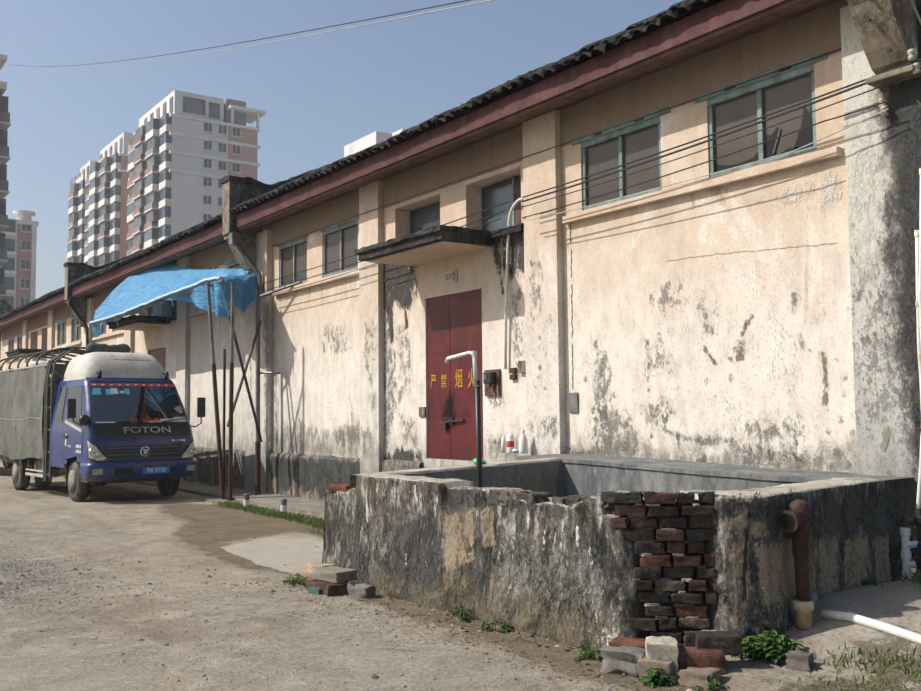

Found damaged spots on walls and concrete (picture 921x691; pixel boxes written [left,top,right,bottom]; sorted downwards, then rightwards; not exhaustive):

damp [912,0,921,62]
damp [263,264,422,500]
damp [491,230,552,377]
peeling [728,314,753,361]
damp [574,76,921,617]
damp [350,480,614,656]